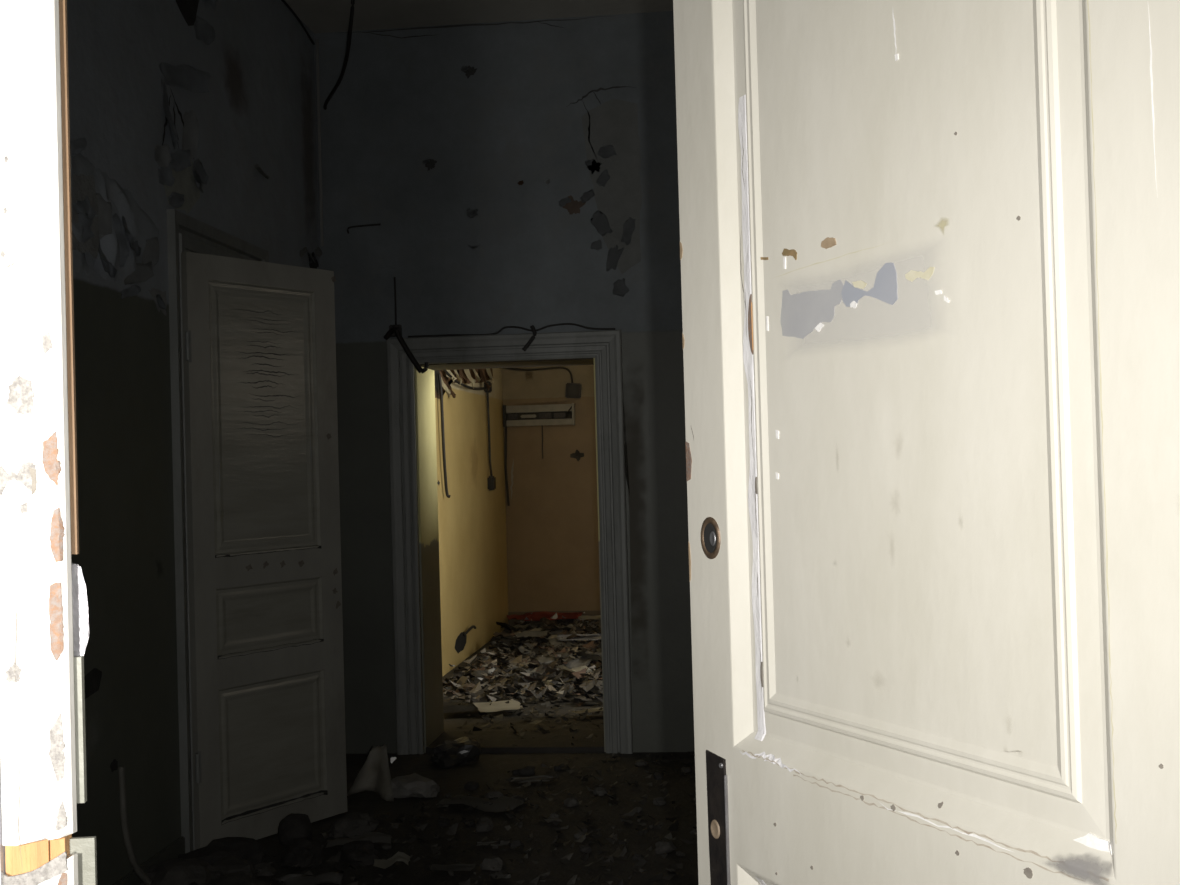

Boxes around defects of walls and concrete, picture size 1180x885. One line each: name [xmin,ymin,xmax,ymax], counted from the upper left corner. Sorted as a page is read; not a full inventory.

peeling [558,99,642,297]
peeling [781,263,898,339]
peeling [6,375,35,415]
peeling [0,431,61,513]
peeling [49,508,65,562]
peeling [49,582,64,661]
peeling [48,712,65,782]